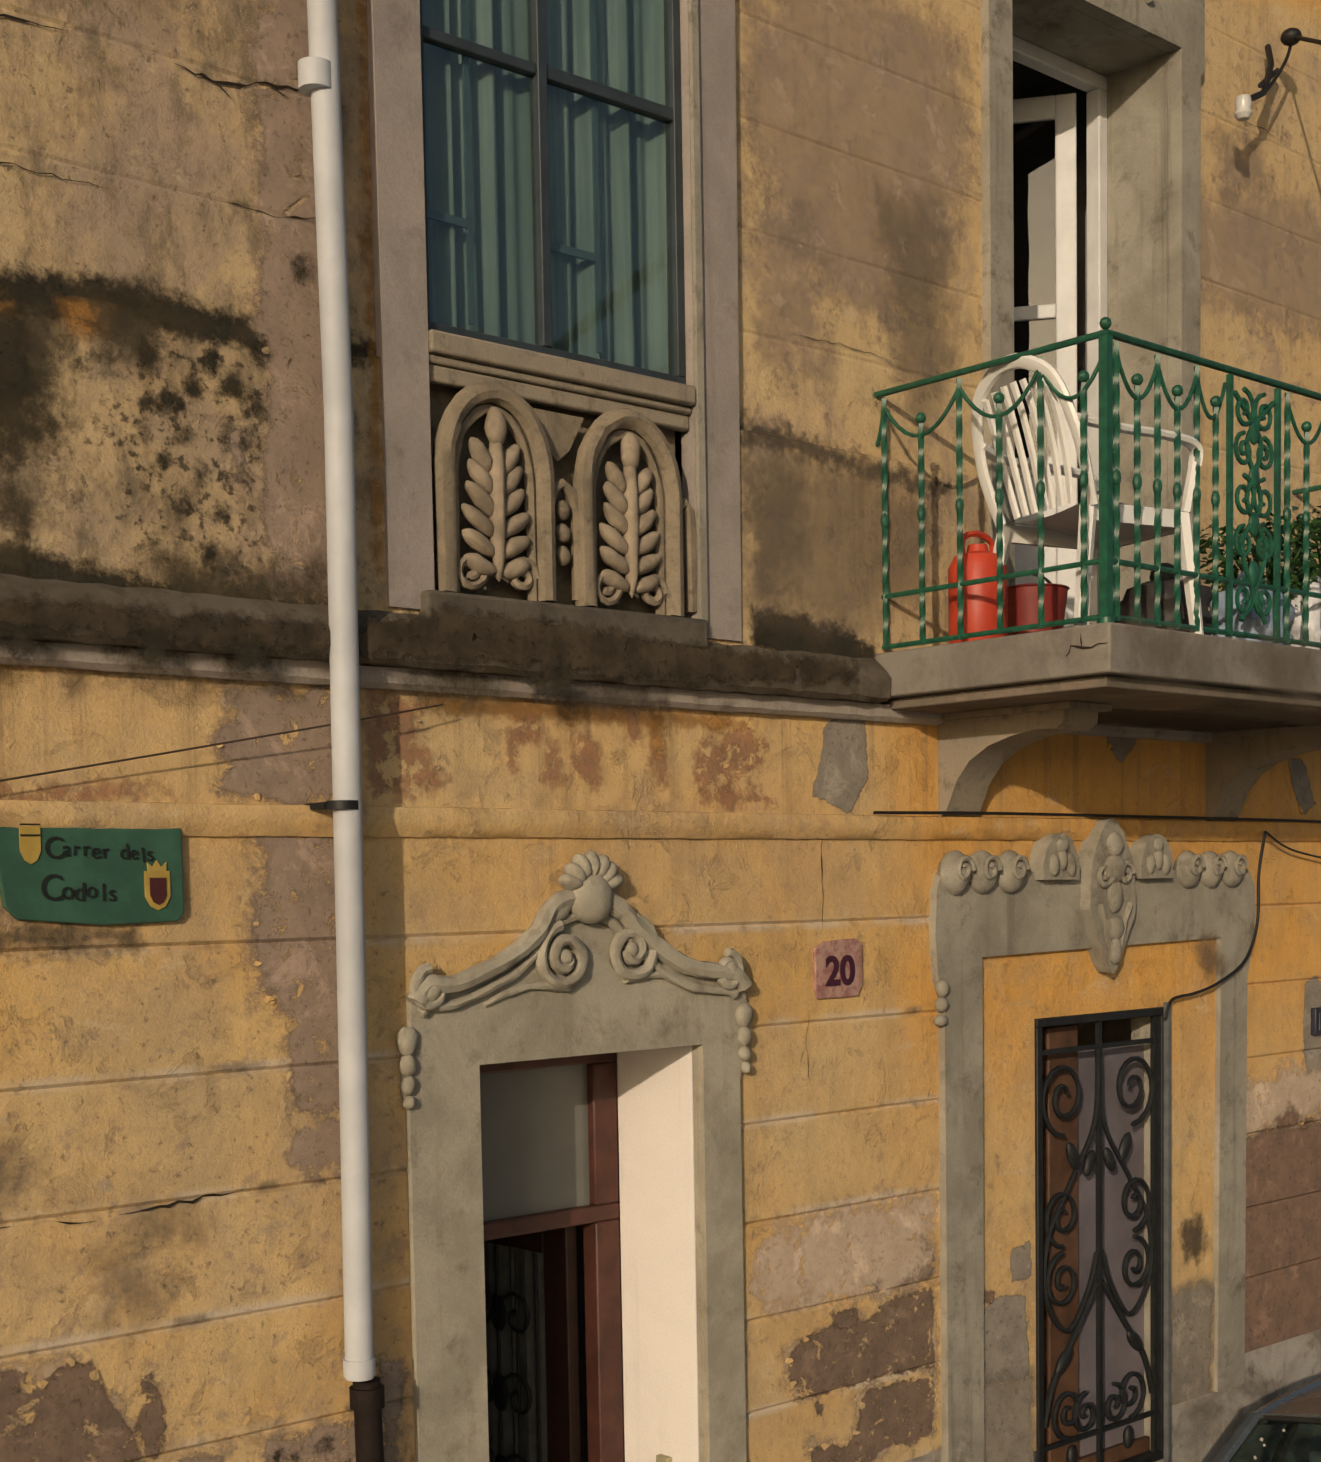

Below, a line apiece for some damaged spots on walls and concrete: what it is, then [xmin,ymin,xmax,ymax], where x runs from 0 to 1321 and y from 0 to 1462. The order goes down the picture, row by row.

crack [0,14,66,31]
crack [176,64,298,100]
damp [291,254,309,280]
damp [350,333,378,367]
damp [0,268,328,605]
peeling [366,692,442,797]
spalling [696,721,769,809]
crack [56,1189,243,1225]
spalling [1245,976,1321,1353]
peeling [749,1190,938,1462]
spalling [0,1354,232,1462]
peeling [260,1416,356,1462]